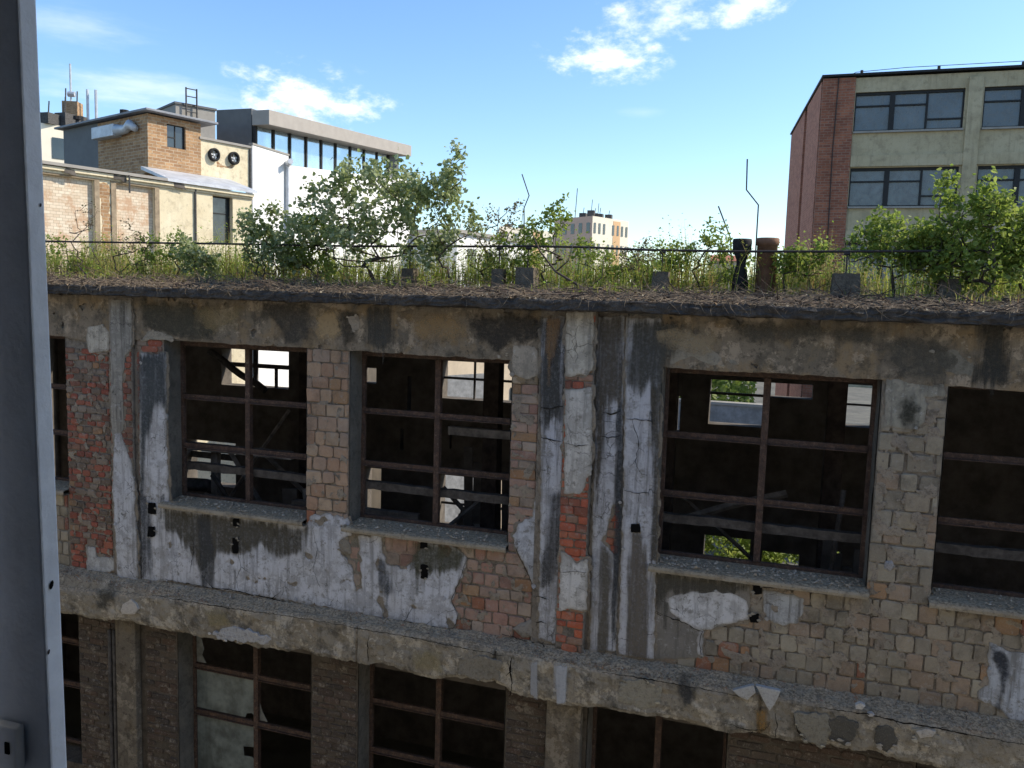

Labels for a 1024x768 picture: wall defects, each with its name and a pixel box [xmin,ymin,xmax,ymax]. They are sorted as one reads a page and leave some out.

water stain [142,302,213,338]
water stain [339,306,391,347]
water stain [972,325,1009,385]
water stain [138,353,166,576]
peeling [85,298,468,628]
crack [541,406,649,513]
peeling [498,311,805,662]
water stain [595,317,744,658]
water stain [163,494,308,588]
peeling [733,683,781,710]
spalling [794,711,898,753]
peeling [972,642,1024,721]